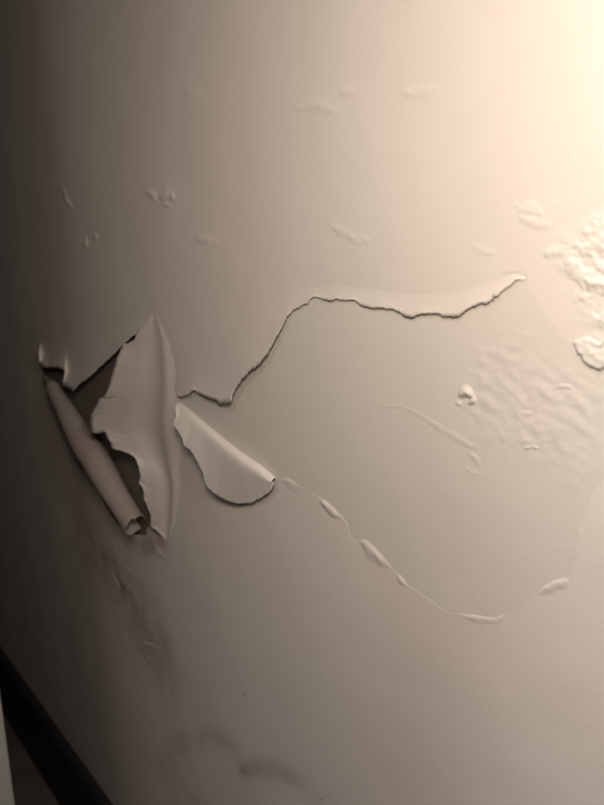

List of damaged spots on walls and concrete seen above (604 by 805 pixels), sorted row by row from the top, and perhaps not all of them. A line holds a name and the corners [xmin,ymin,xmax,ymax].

peeling [38,271,604,625]